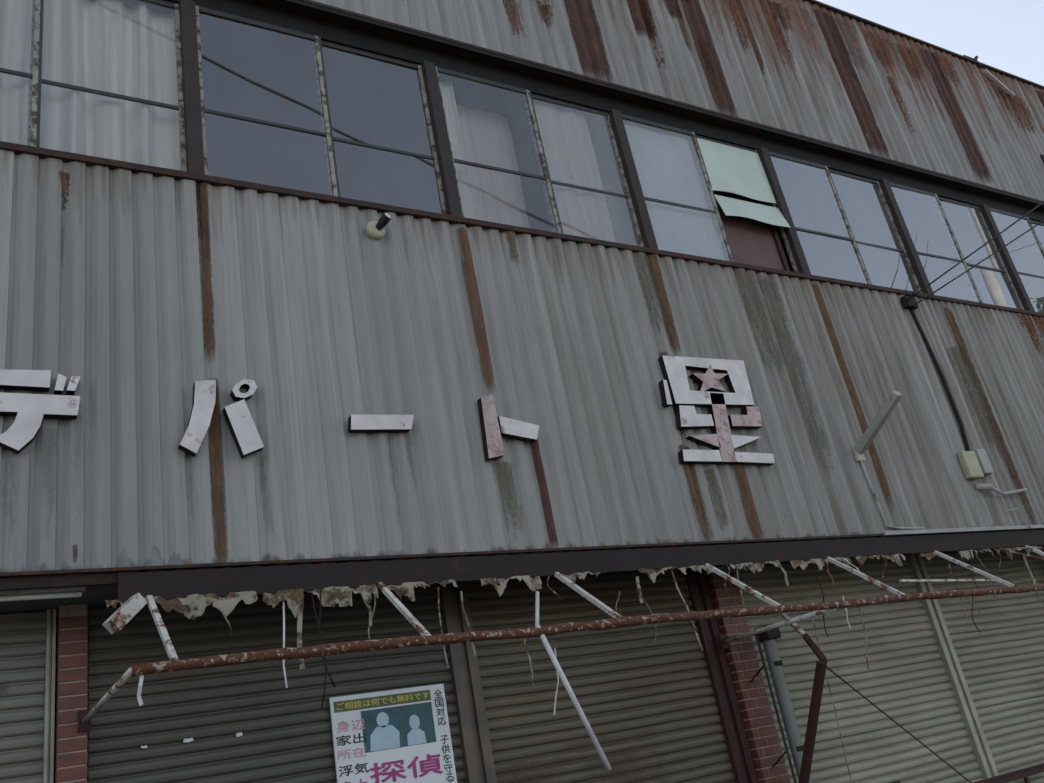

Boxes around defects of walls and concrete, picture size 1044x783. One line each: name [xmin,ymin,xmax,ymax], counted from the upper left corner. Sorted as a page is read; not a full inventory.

corrosion [503,0,524,38]
corrosion [536,0,612,79]
corrosion [627,0,667,70]
corrosion [665,0,736,112]
corrosion [724,0,767,82]
corrosion [804,9,888,153]
corrosion [864,30,992,178]
corrosion [983,73,1044,135]
corrosion [196,182,215,354]
corrosion [456,227,494,387]
corrosion [811,284,891,501]
corrosion [208,379,227,561]